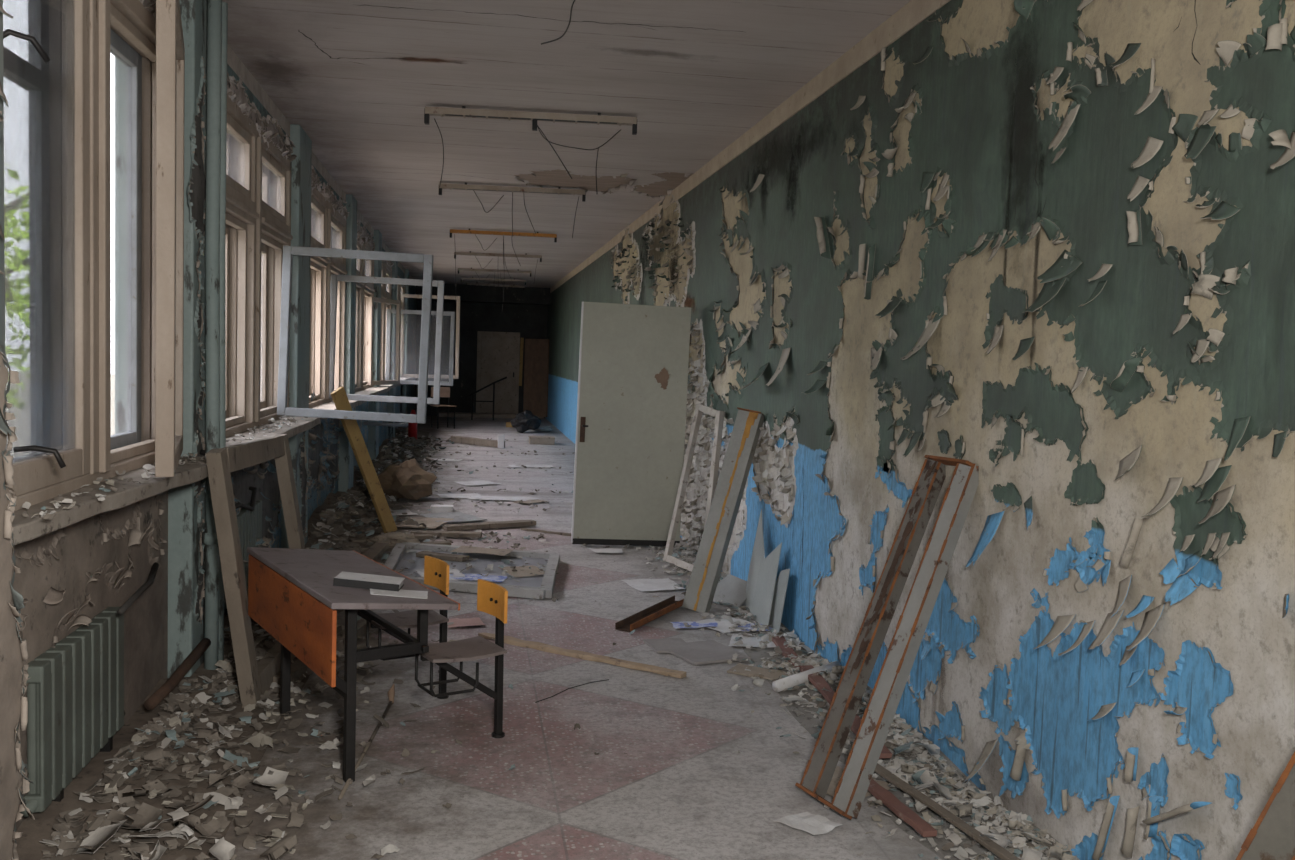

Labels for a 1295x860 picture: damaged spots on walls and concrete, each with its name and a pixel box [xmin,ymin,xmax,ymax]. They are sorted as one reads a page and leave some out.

flaking render [139,0,156,16]
peeling [0,82,8,122]
peeling [509,169,696,307]
peeling [680,174,794,555]
peeling [722,0,1295,860]
peeling [0,340,167,860]
peeling [72,771,230,860]